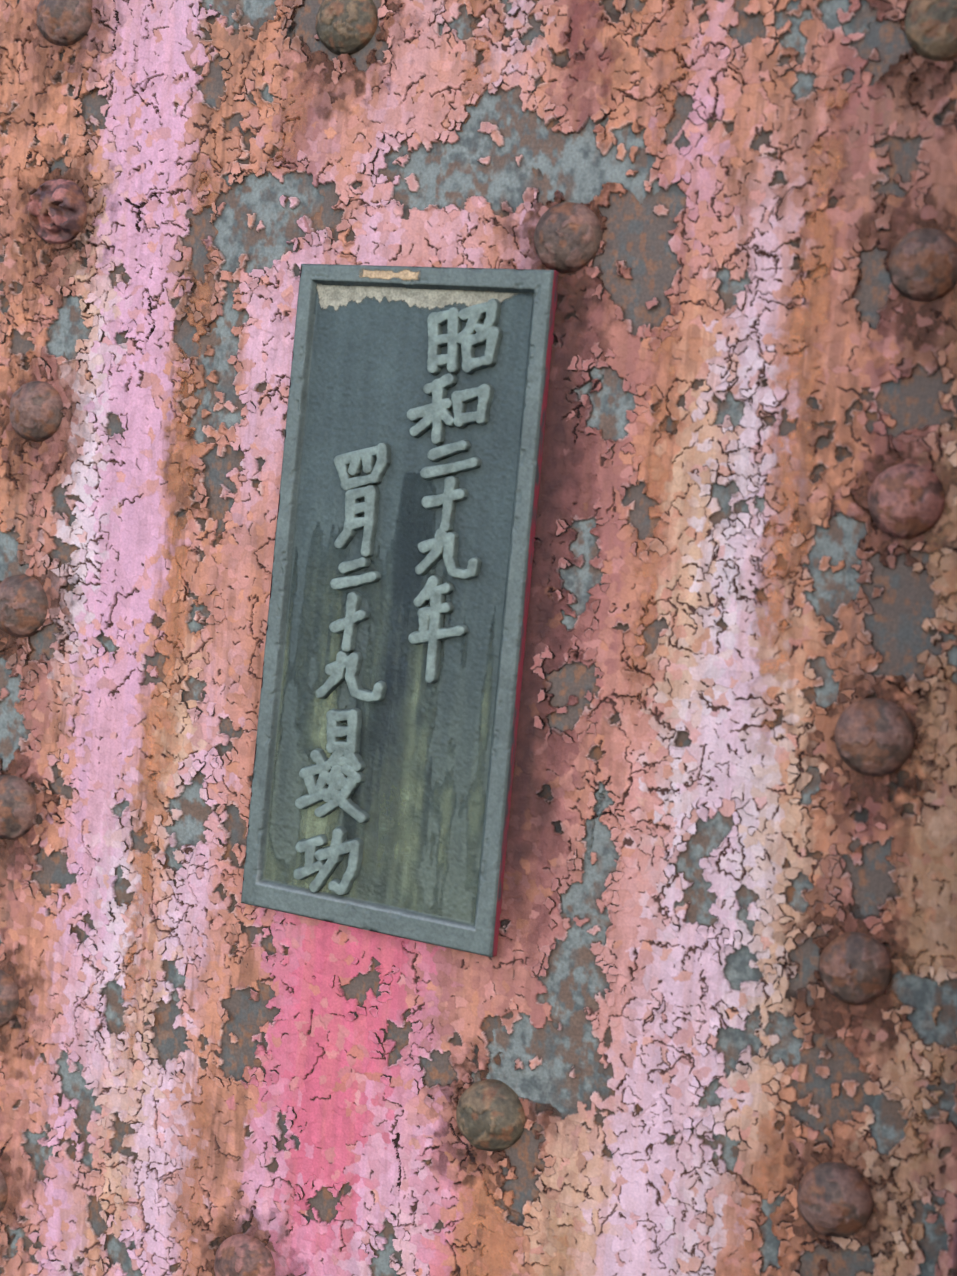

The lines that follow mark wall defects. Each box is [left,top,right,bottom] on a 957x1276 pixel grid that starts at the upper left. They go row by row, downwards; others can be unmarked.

crack [111,0,119,51]
crack [125,193,163,232]
crack [145,296,155,346]
peeling [530,342,672,743]
corrosion [851,443,957,569]
peeling [66,653,257,956]
corrosion [807,676,934,823]
peeling [94,944,195,1083]
peeling [658,783,957,1181]
corrosion [797,896,914,1049]
peeling [0,1044,148,1276]
corrosion [776,1137,904,1270]